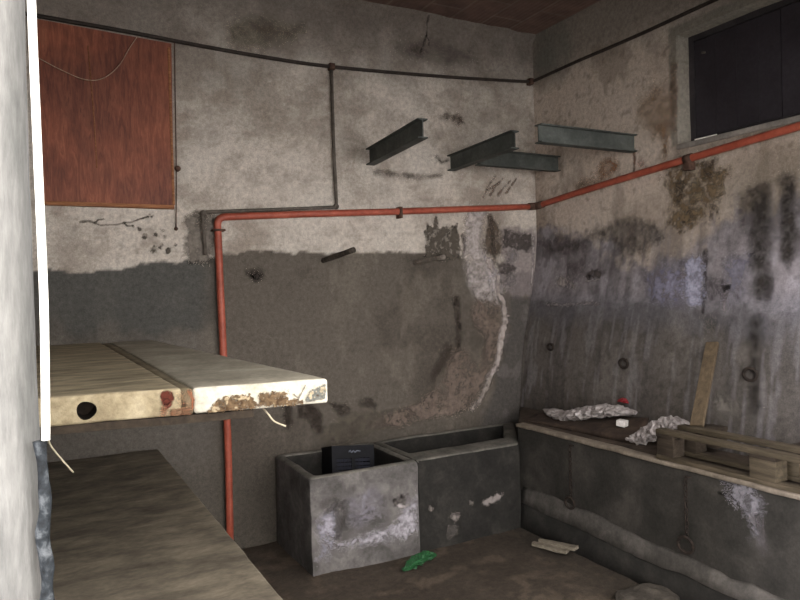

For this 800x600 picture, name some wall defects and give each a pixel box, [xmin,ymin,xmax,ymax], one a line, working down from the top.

crack [80,216,149,227]
peeling [424,216,466,261]
peeling [503,229,532,253]
damp [724,183,773,300]
damp [780,176,799,263]
peeling [497,262,516,277]
damp [646,250,708,313]
flaking render [324,298,502,446]
rust [160,390,194,416]
spalling [207,384,326,413]
damp [317,489,418,558]